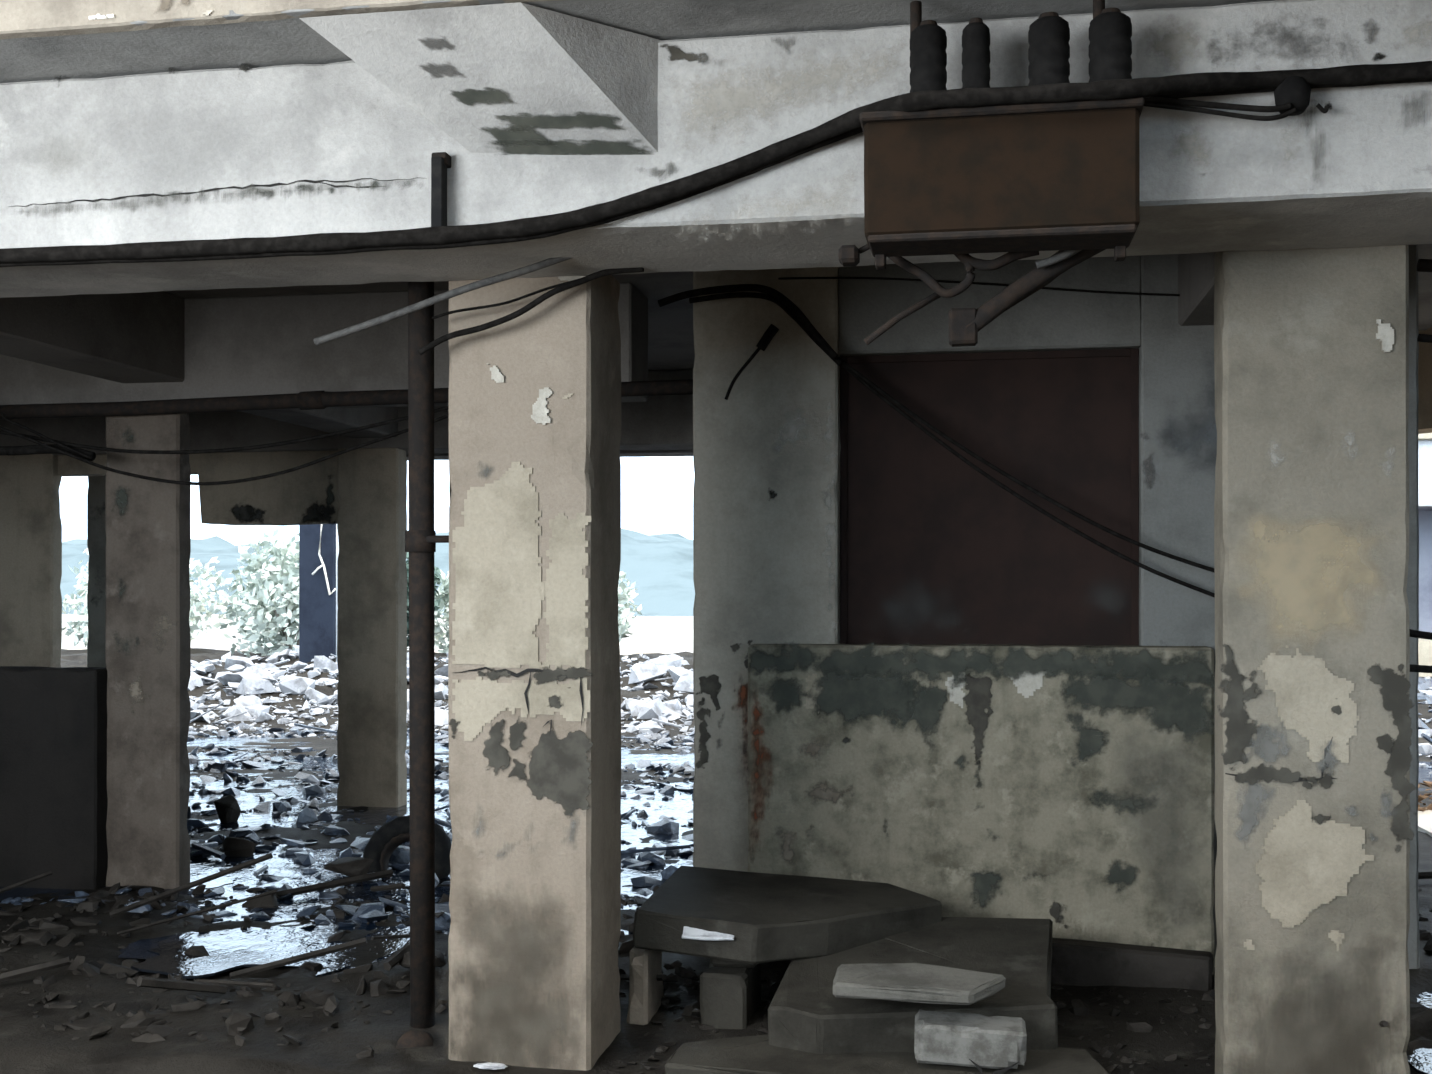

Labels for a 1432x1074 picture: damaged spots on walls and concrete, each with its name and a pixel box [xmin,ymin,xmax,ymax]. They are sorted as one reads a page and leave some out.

spalling [419,38,650,155]
peeling [448,462,593,816]
crack [453,667,592,733]
water stain [696,674,722,769]
corrosion [737,685,771,839]
water stain [730,640,1215,787]
water stain [1090,790,1155,813]
peeling [1219,644,1417,928]
water stain [971,871,1002,908]
water stain [1049,902,1067,928]
water stain [1105,861,1137,891]
peeling [1328,930,1344,951]